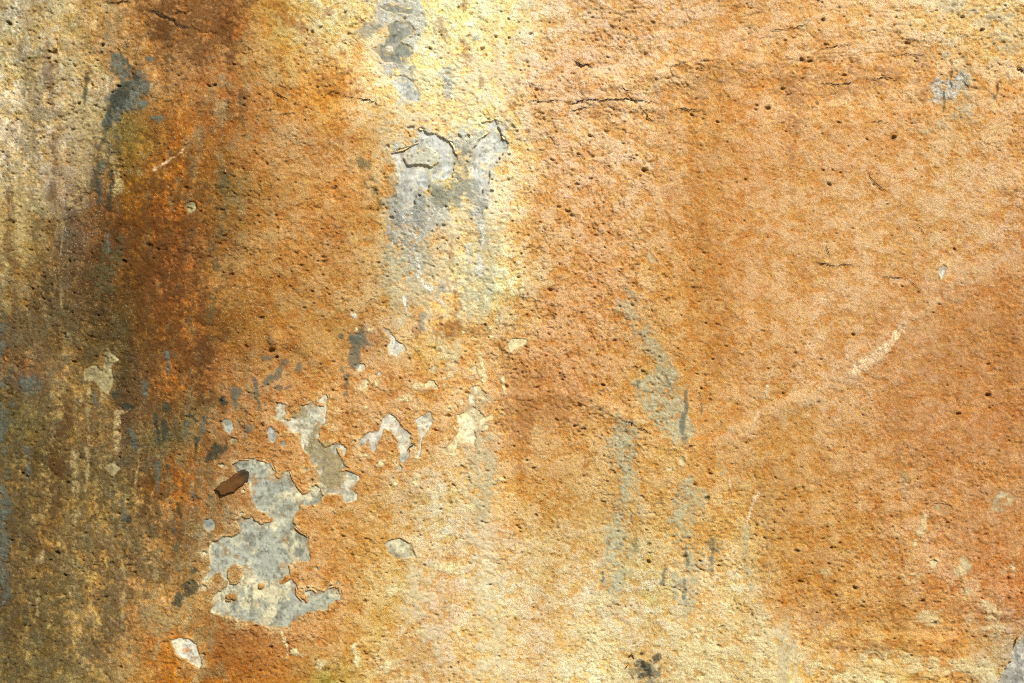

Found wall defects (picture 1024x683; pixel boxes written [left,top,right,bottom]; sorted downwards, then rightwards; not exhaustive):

crack [531,87,701,123]
flaking render [385,120,518,219]
flaking render [201,382,433,628]
flaking render [171,635,202,668]